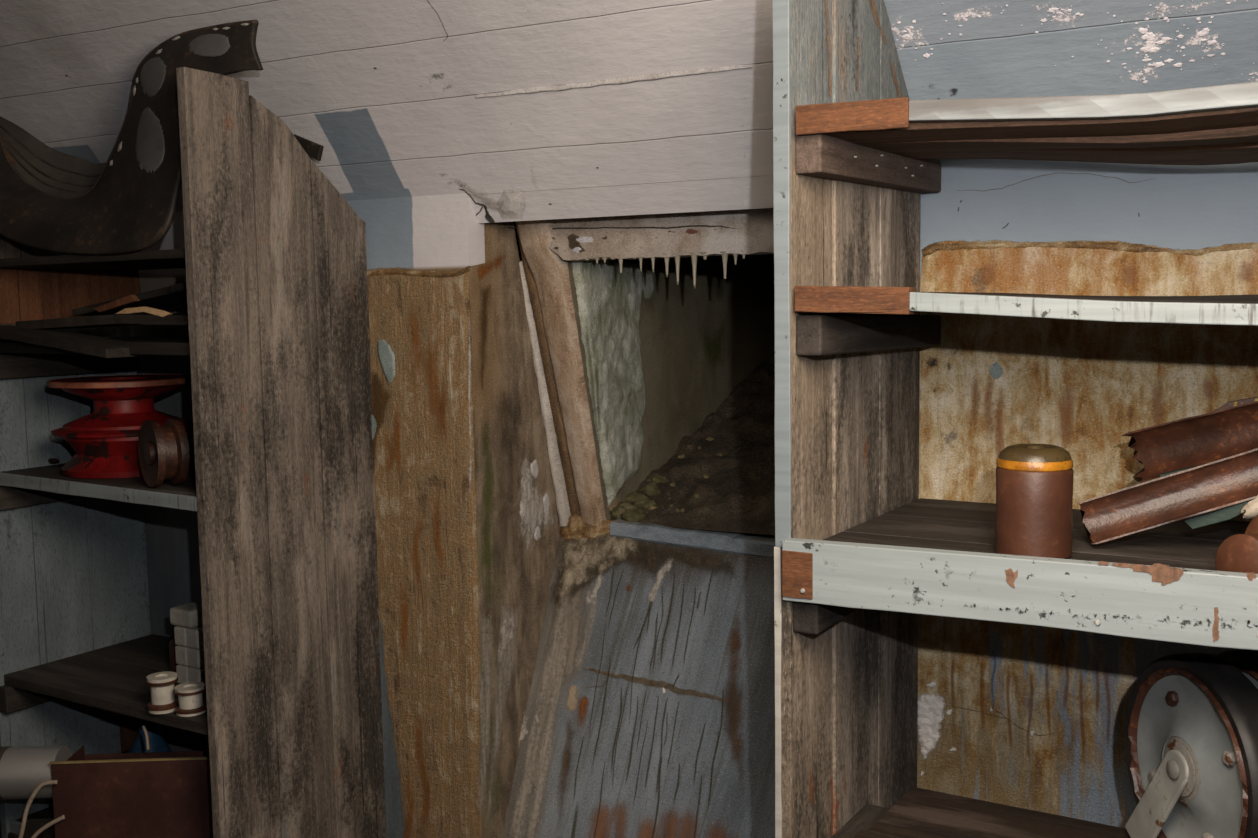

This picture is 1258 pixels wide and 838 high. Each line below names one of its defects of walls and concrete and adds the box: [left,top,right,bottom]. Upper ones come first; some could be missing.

peeling [870,0,1008,61]
peeling [1021,4,1084,33]
peeling [1097,0,1248,88]
water stain [920,240,1258,296]
water stain [919,312,1258,509]
water stain [513,259,723,838]
crack [585,668,725,701]
water stain [915,601,1245,829]